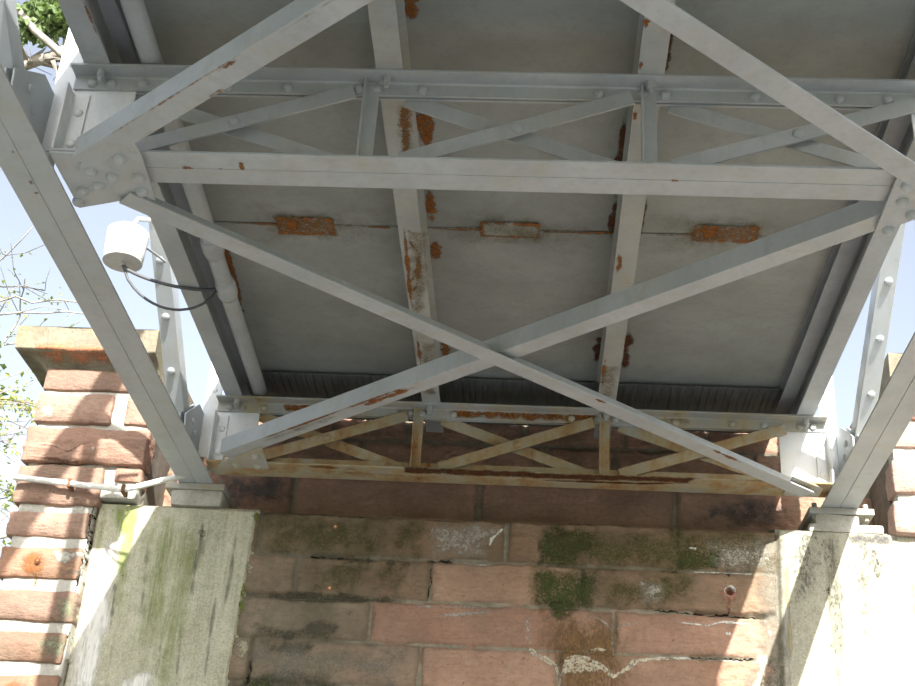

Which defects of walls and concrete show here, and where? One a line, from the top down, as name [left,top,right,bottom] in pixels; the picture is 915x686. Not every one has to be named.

rust [400,108,435,151]
rust [614,113,637,161]
rust [243,217,336,236]
rust [425,192,617,238]
rust [404,232,442,309]
rust [592,338,613,403]
rust [622,335,633,367]
rust [404,467,695,485]
damp [849,535,897,588]
damp [71,542,116,686]
damp [527,570,730,686]
damp [122,673,151,686]